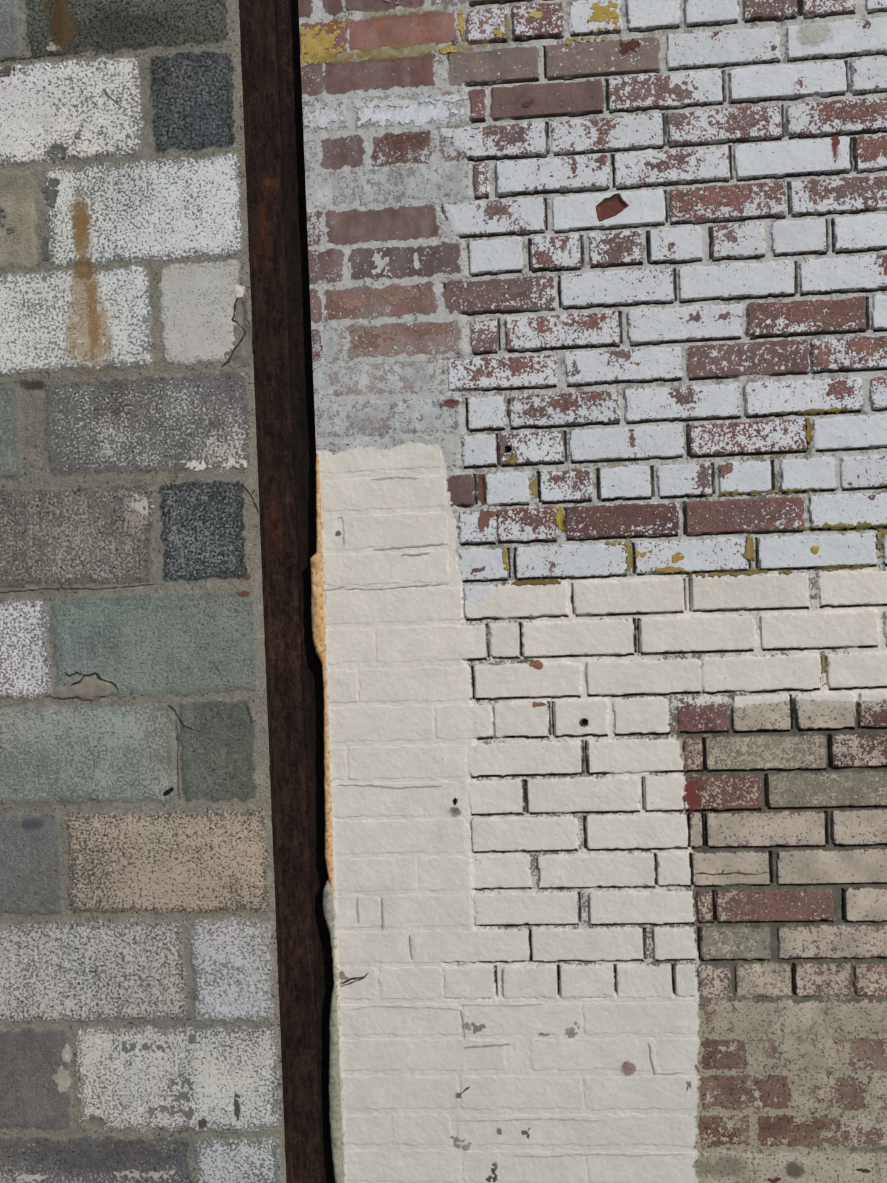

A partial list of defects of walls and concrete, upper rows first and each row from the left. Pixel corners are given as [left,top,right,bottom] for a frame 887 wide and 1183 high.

peeling [609,73,708,126]
peeling [645,152,690,172]
peeling [474,167,522,229]
spalling [596,193,629,221]
peeling [805,176,887,208]
corrosion [72,190,95,278]
peeling [468,332,540,380]
peeling [524,392,604,418]
peeling [671,388,703,410]
peeling [813,336,887,415]
peeling [477,462,887,578]
peeling [502,547,561,586]